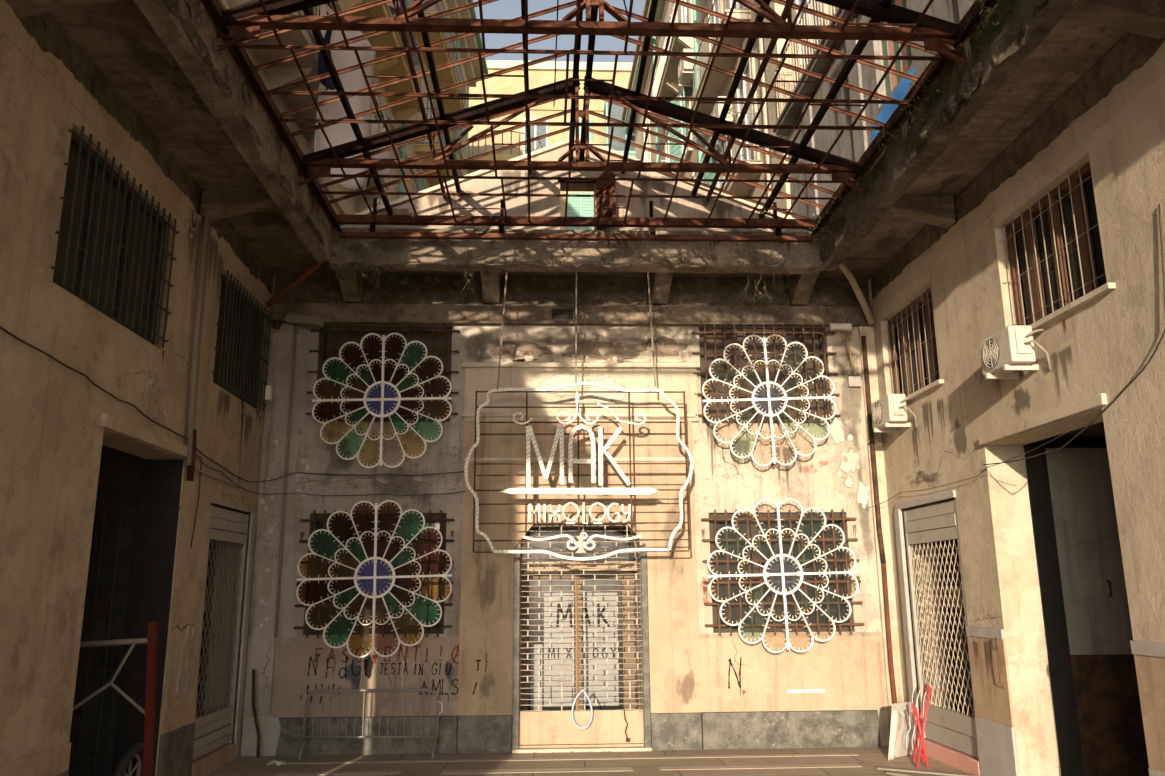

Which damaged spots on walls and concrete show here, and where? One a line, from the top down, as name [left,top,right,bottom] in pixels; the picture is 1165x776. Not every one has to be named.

flaking render [477,333,689,405]